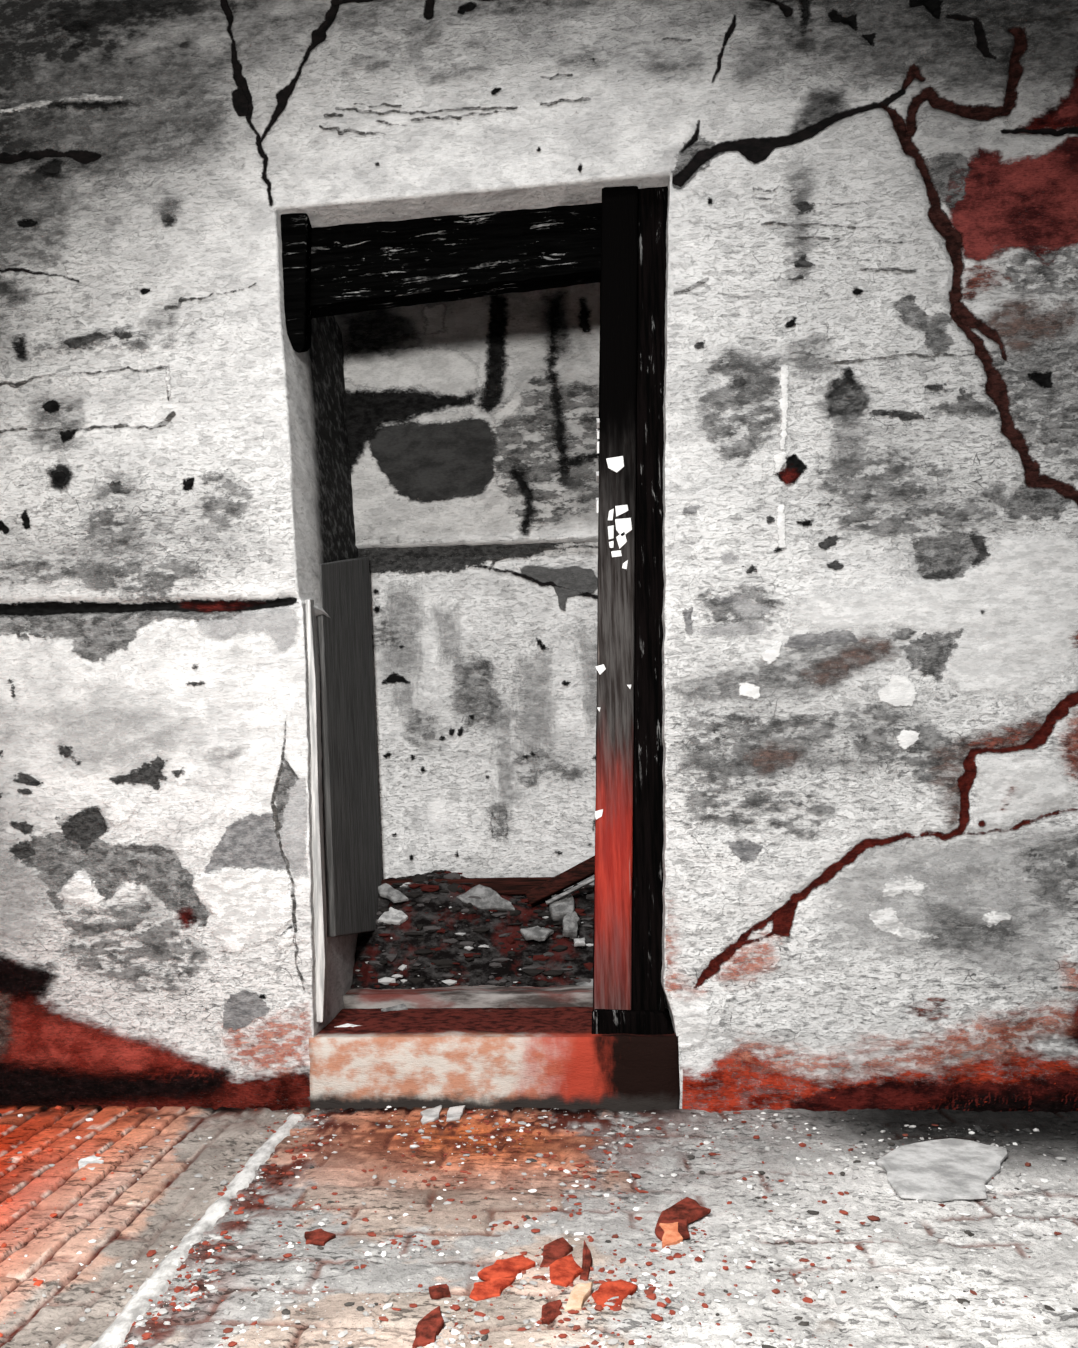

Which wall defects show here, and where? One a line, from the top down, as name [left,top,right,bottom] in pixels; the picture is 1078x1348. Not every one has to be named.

crack [220,0,373,206]
crack [319,73,588,135]
crack [664,0,793,82]
flaking render [924,66,1078,299]
crack [672,10,1078,505]
spalling [773,451,807,484]
flaking render [822,342,1078,480]
crack [0,597,297,616]
peeling [0,772,43,798]
peeling [57,745,81,765]
flaking render [9,756,307,927]
crack [694,691,1078,988]